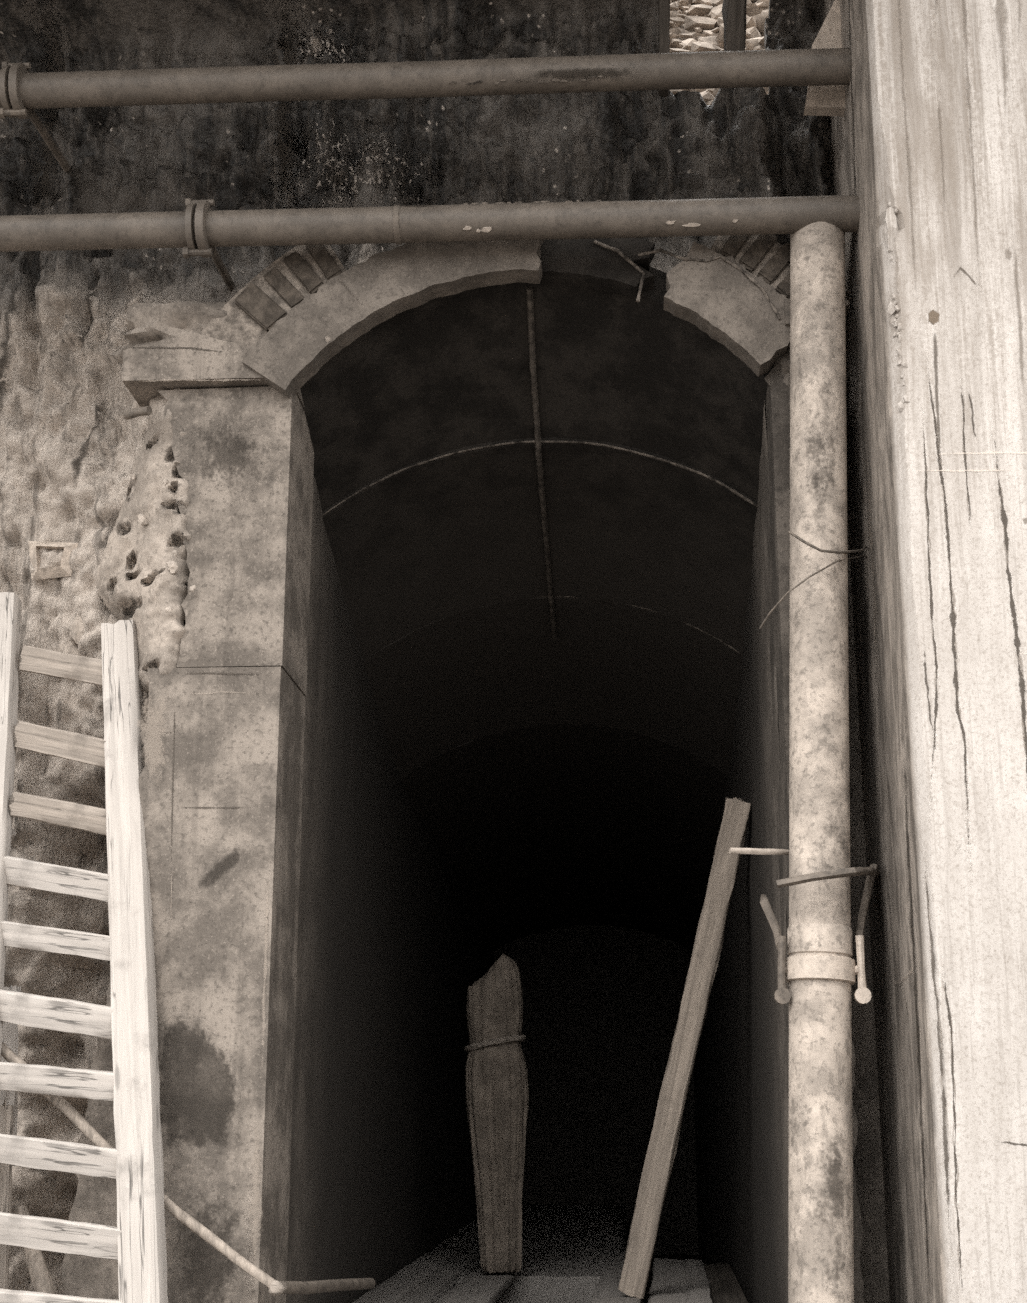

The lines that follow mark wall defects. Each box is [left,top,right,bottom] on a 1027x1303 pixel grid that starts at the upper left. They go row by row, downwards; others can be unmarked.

spalling [96,388,196,693]
spalling [764,347,790,387]
crack [923,383,1027,838]
crack [925,872,962,1282]